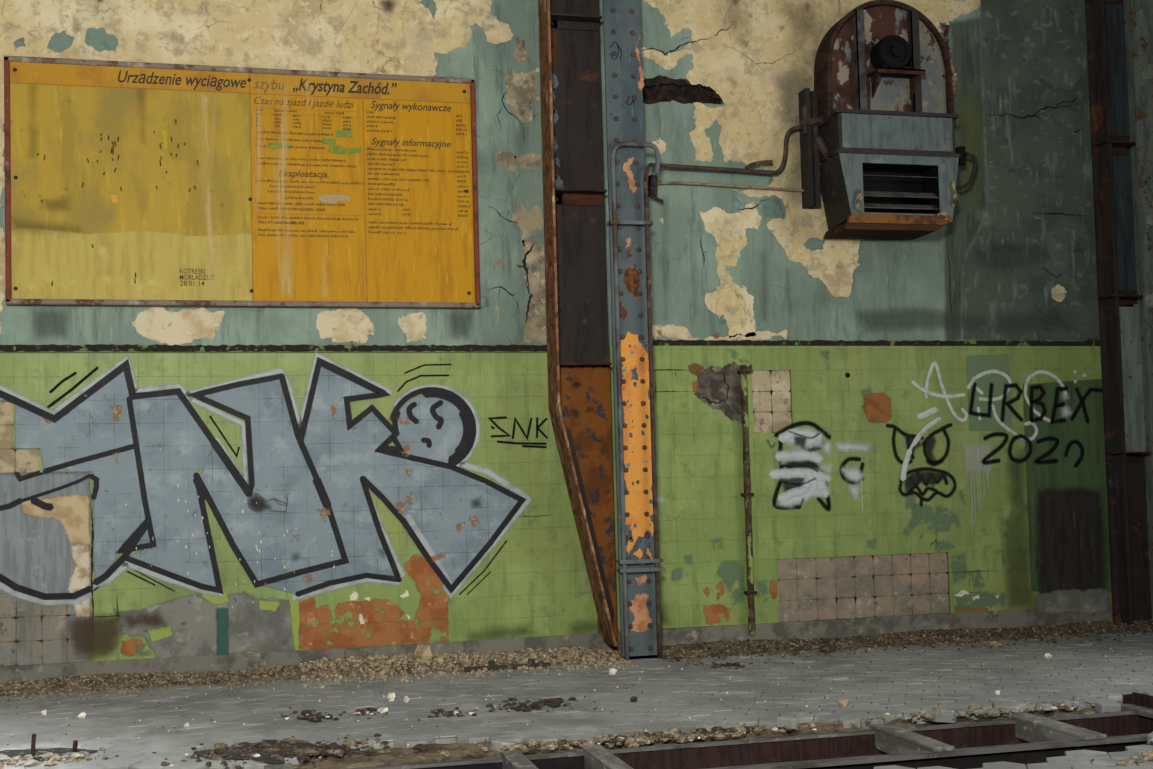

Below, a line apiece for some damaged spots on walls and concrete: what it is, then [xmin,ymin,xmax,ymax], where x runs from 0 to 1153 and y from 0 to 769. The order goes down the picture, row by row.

crack [641,26,790,67]
peeling [895,0,981,98]
peeling [0,0,542,208]
crack [988,98,1083,135]
peeling [641,0,873,341]
peeling [511,203,547,344]
peeling [132,307,225,345]
peeling [316,308,374,344]
peeling [398,312,427,343]
peeling [695,361,792,433]
peeling [0,401,92,666]
peeling [275,553,455,650]